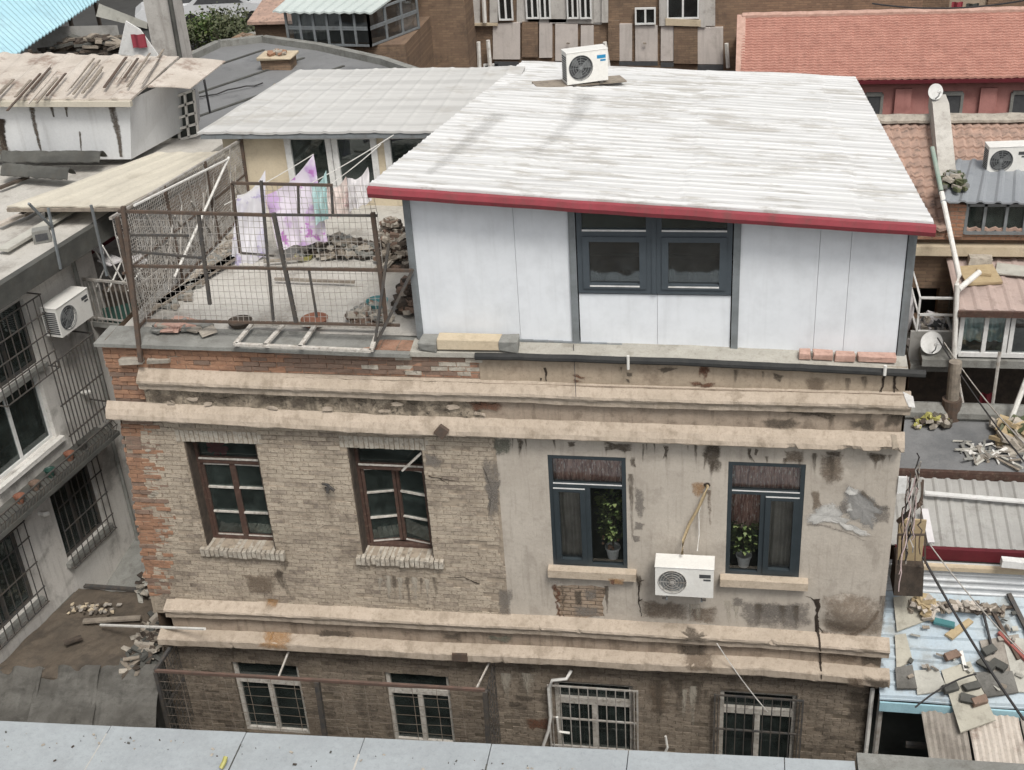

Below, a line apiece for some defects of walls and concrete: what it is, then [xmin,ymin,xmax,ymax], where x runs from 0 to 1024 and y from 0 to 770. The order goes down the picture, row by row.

water stain [483,438,527,516]
water stain [695,445,721,473]
water stain [784,451,841,481]
flaking render [120,420,176,596]
spalling [807,487,890,536]
water stain [499,590,512,614]
peeling [551,580,608,618]
water stain [826,595,886,633]
crack [806,596,822,679]